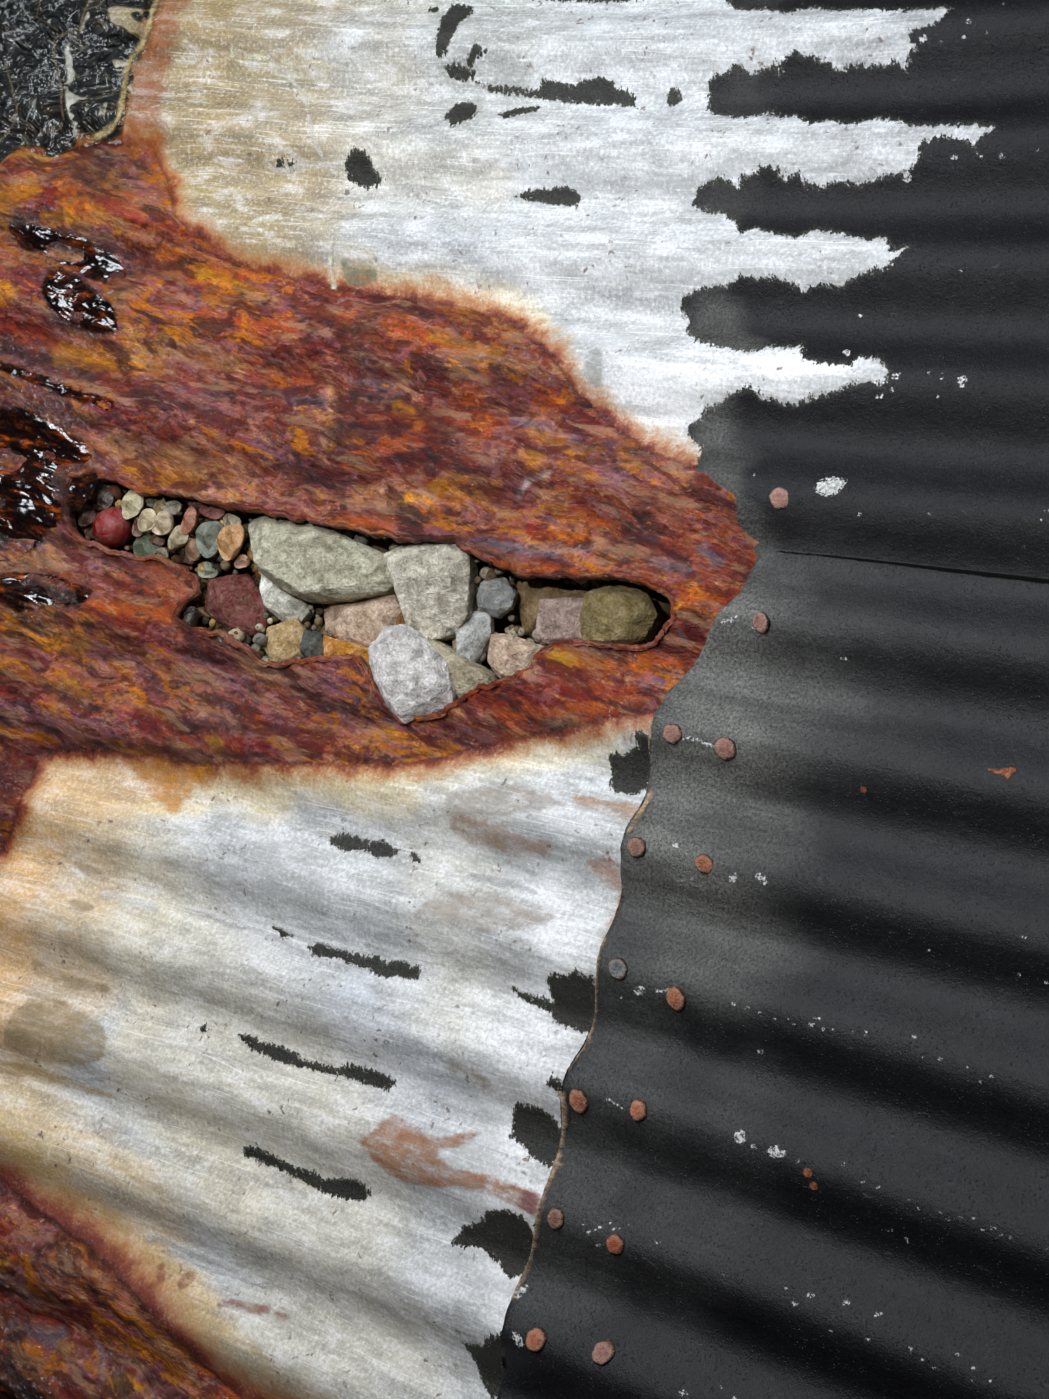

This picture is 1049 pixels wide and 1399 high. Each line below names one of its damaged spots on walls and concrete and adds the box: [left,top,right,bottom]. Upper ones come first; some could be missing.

peeling [444,99,479,127]
peeling [428,3,636,120]
peeling [667,87,682,106]
damp [9,225,126,334]
peeling [680,0,1049,578]
corrosion [0,0,759,867]
corrosion [0,1159,293,1399]